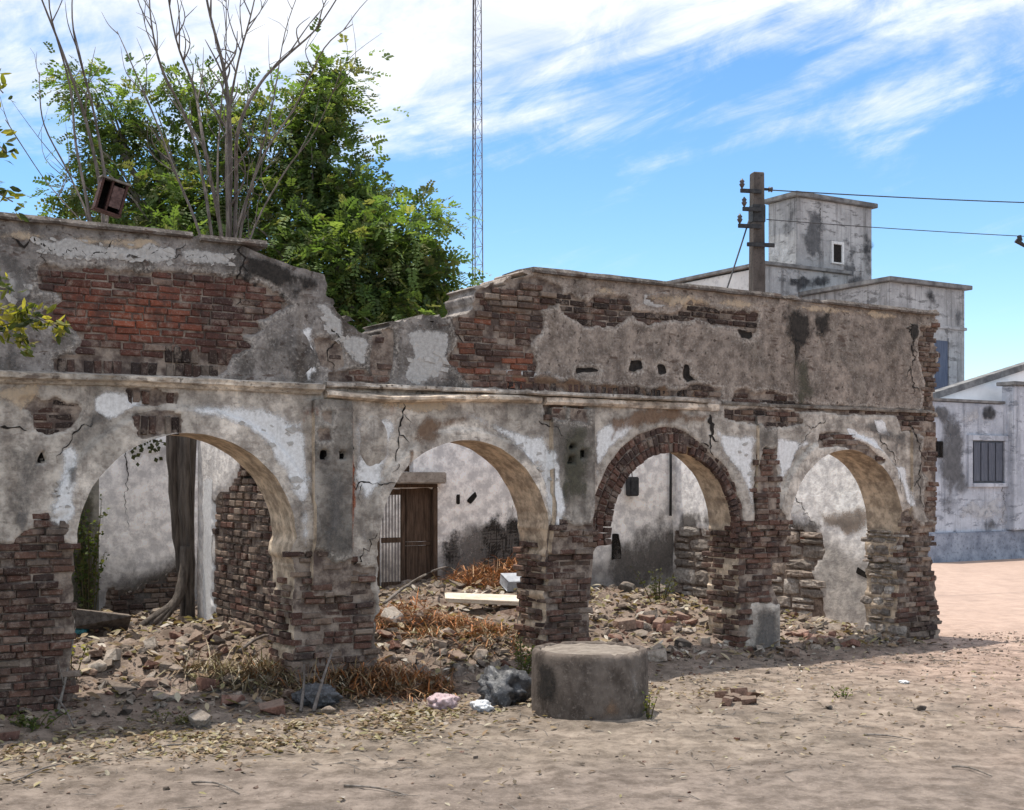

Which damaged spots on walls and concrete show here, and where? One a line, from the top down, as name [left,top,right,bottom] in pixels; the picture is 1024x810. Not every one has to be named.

damp [805,212,824,255]
spalling [5,231,286,377]
damp [785,309,831,404]
crack [907,323,920,398]
crack [56,423,92,459]
peeling [195,407,309,501]
crack [354,403,414,500]
spalling [406,283,942,649]
crack [702,414,718,455]
damp [936,406,996,510]
spalling [0,447,81,718]
spalling [202,465,383,688]